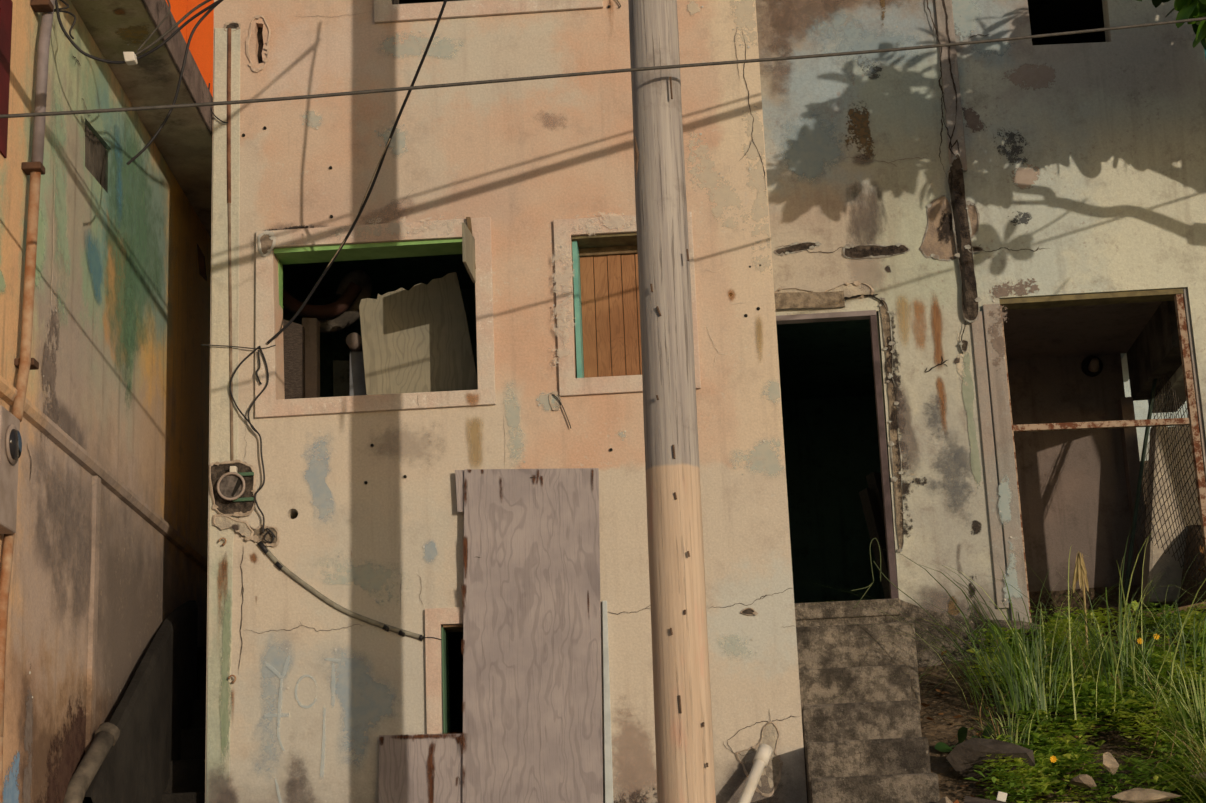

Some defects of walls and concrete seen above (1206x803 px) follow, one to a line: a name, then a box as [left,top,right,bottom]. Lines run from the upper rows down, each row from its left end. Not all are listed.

peeling [743,106,821,272]
spalling [774,281,905,552]
rust [900,300,946,425]
spalling [842,153,1039,369]
crack [844,0,1050,373]